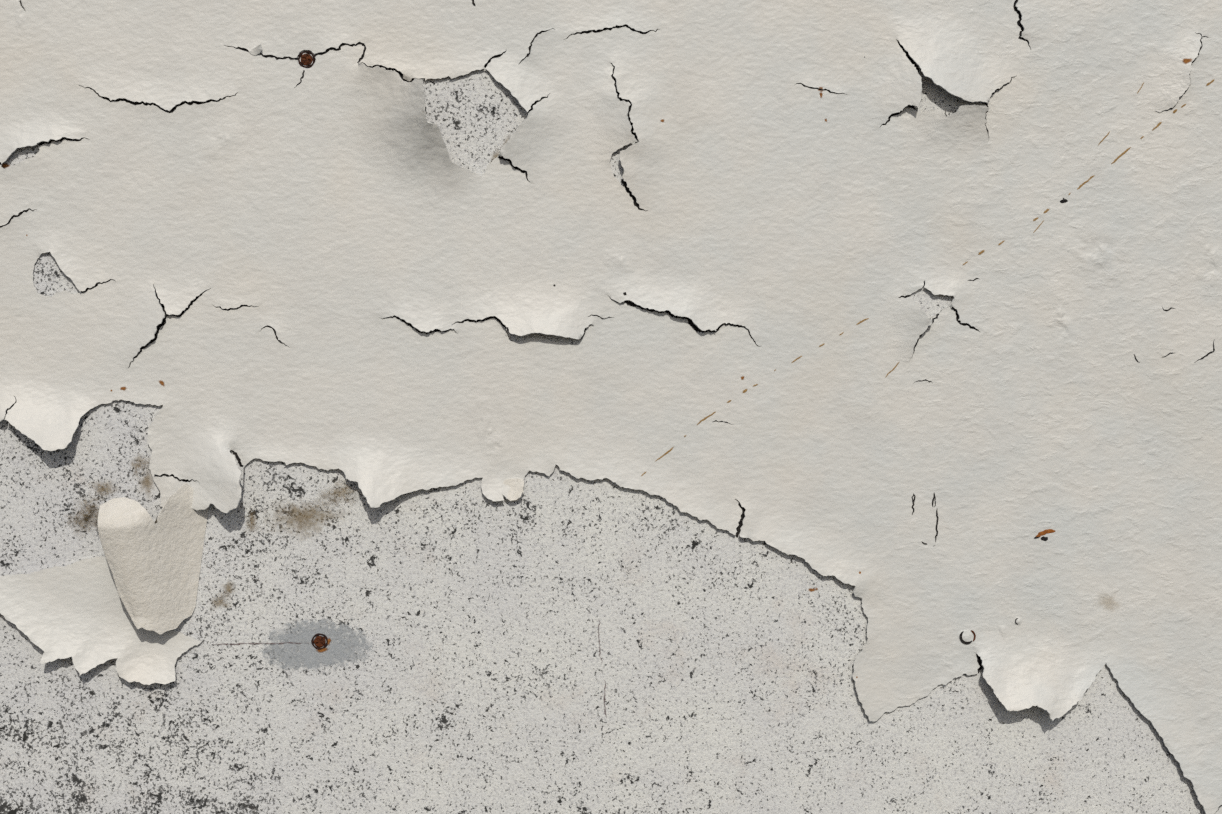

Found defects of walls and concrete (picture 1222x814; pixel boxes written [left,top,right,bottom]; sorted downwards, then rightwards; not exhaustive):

corrosion [298,51,315,68]
crack [0,30,366,240]
peeling [343,43,571,199]
crack [518,9,680,218]
peeling [28,230,115,296]
crack [114,278,293,369]
crack [373,271,766,347]
peeling [887,267,981,365]
corrosion [311,633,331,652]
peeling [0,376,1222,814]